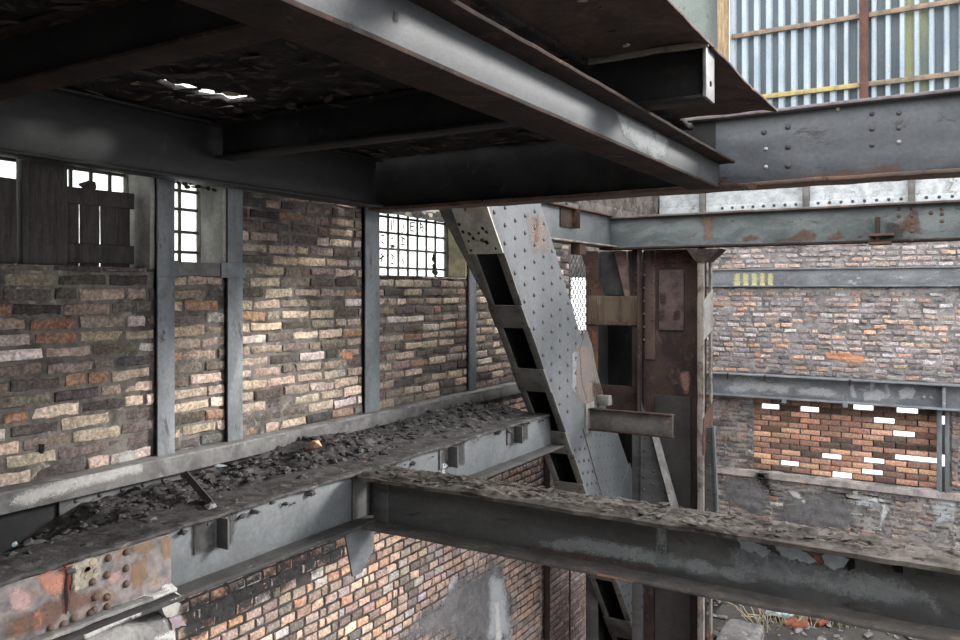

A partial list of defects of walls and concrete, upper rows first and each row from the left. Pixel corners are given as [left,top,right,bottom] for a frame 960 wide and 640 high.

rust [131,535,171,588]
peeling [736,540,855,584]
rust [5,572,104,639]
leakage [487,576,513,640]